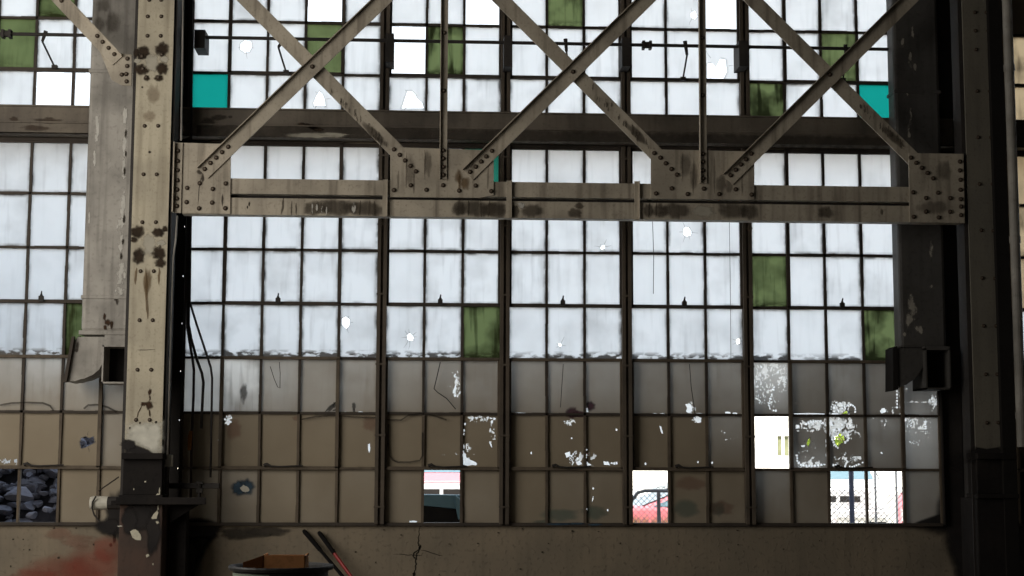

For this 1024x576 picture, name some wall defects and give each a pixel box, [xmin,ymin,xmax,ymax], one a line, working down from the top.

damp [453,201,541,217]
peeling [127,421,162,453]
crack [400,528,442,576]